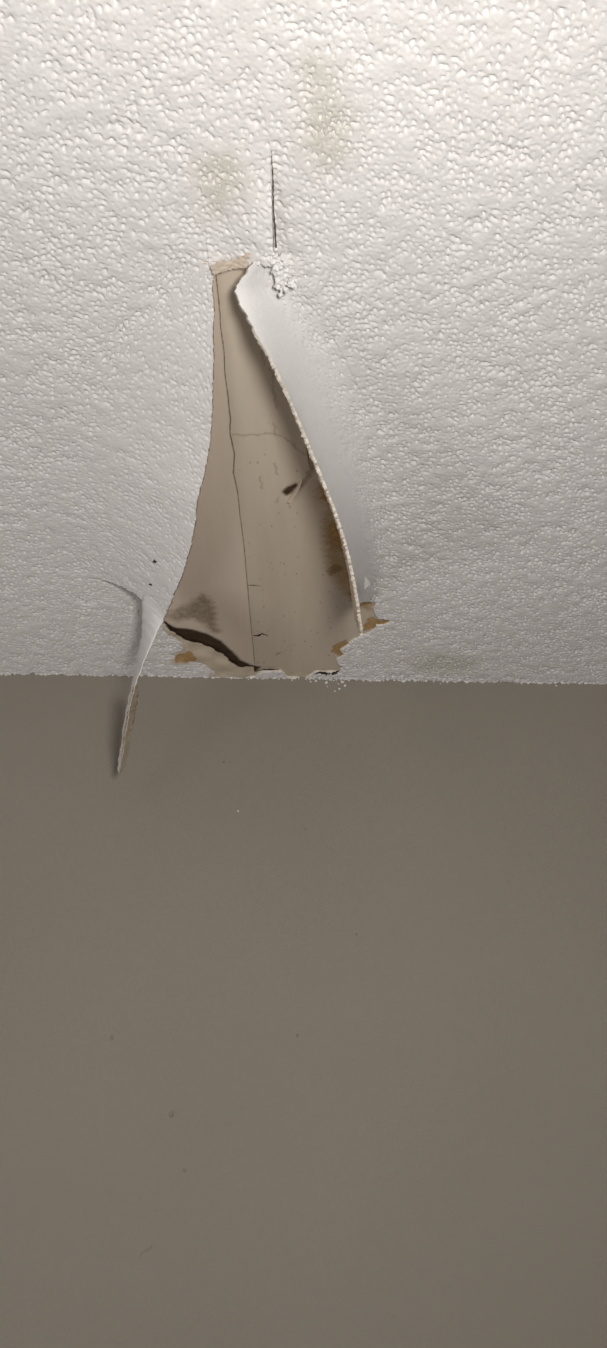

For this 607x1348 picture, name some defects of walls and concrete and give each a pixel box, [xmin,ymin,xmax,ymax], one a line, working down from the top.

peeling [44,134,389,774]